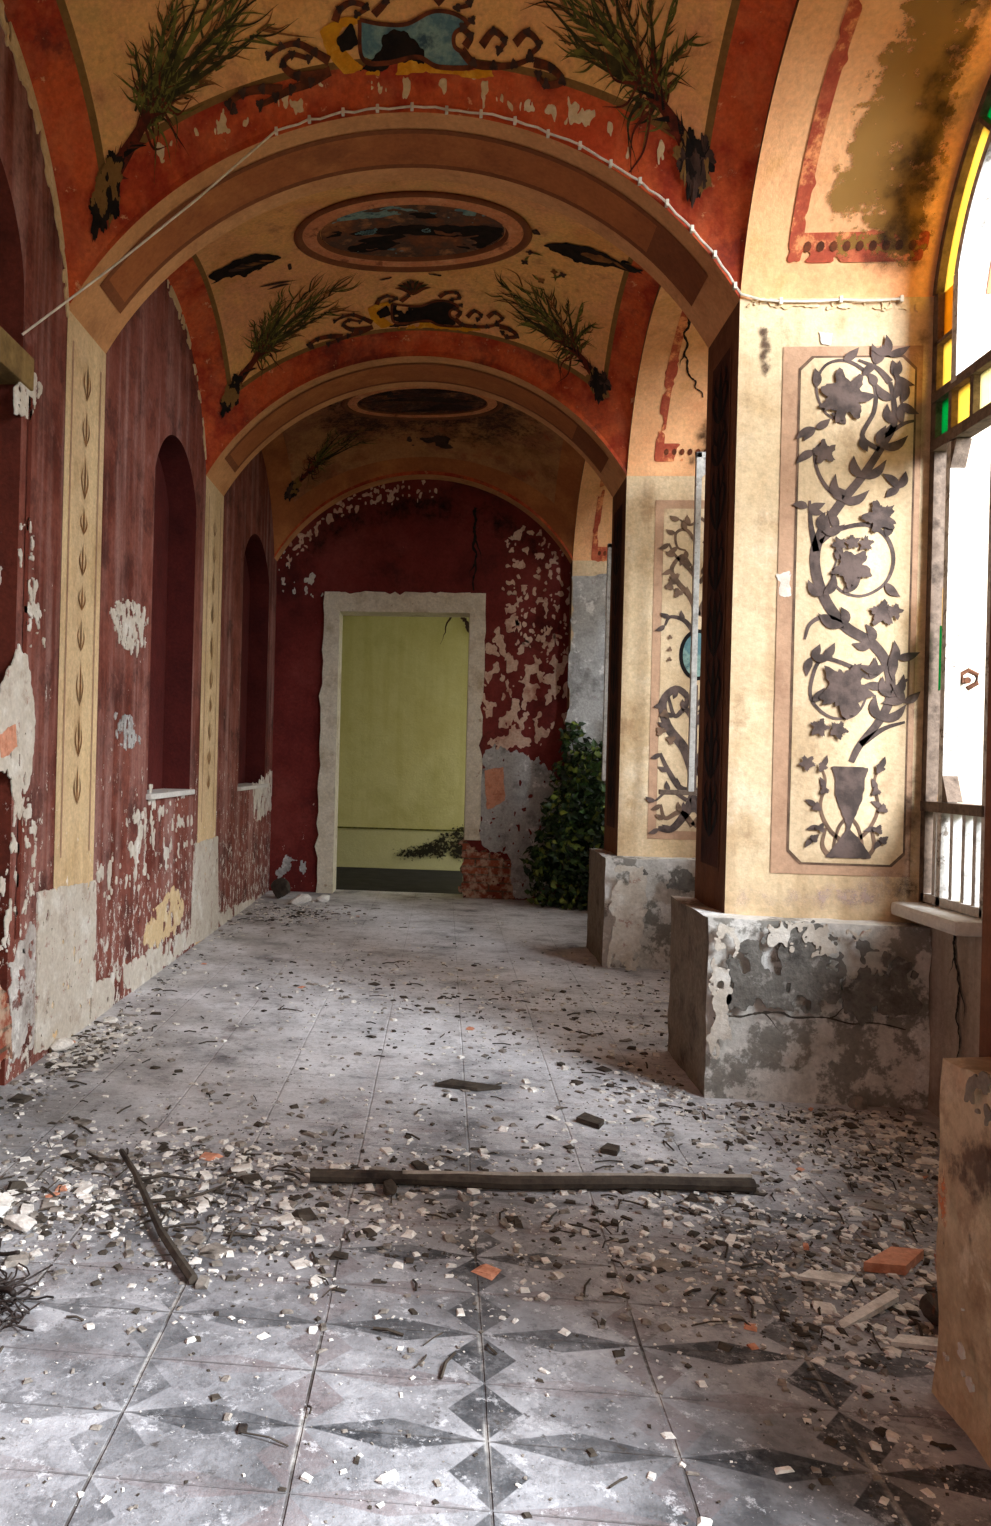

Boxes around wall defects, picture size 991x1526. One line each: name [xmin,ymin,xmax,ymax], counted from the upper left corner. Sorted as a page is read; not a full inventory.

crack [680,318,703,398]
peeling [279,480,437,598]
crack [440,507,482,644]
flaking render [458,525,570,900]
peeling [0,518,264,1069]
peeling [252,770,272,821]
peeling [275,855,307,878]
crack [948,935,965,1057]